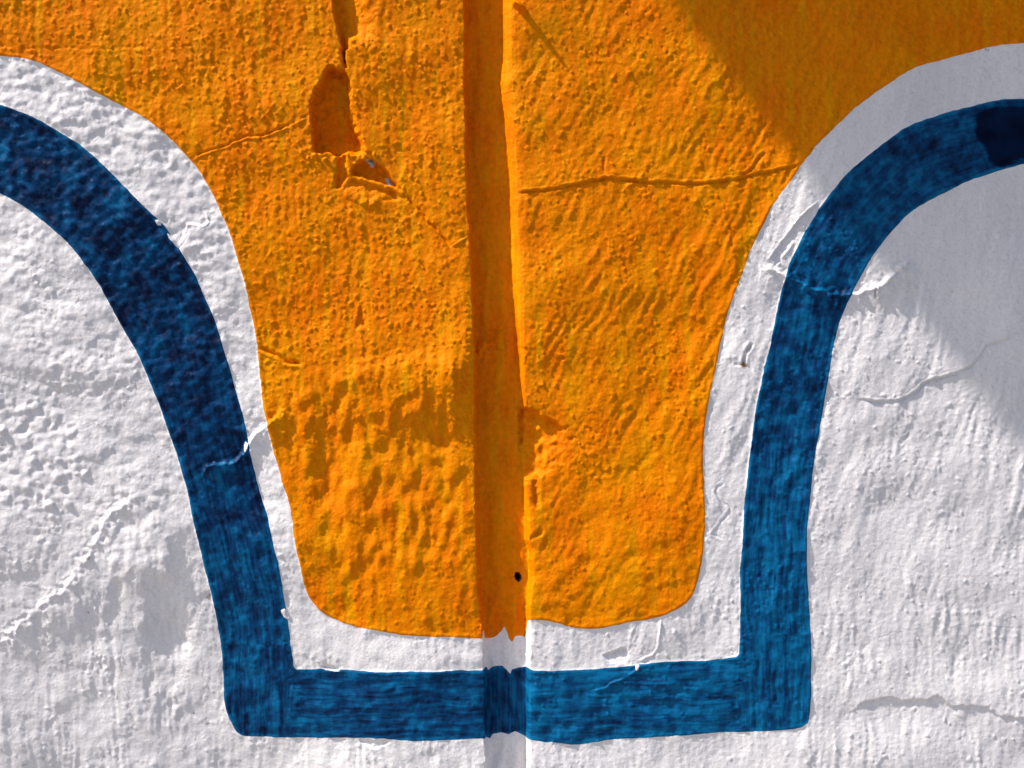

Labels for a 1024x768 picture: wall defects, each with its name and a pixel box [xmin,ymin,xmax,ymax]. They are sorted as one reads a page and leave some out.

flaking render [309,0,406,208]
crack [513,150,806,197]
crack [754,254,916,301]
crack [854,332,1020,406]
crack [197,404,284,481]